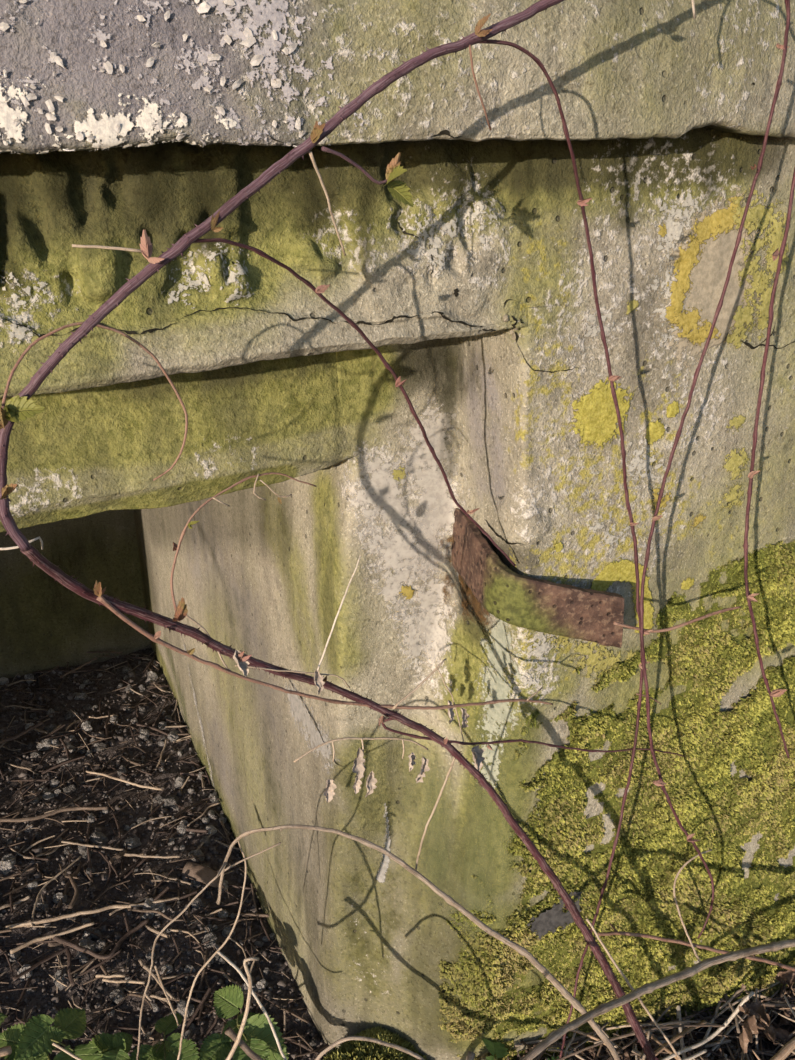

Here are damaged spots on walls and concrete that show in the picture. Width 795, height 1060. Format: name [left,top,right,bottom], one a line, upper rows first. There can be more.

peeling [0,0,40,45]
peeling [0,66,40,112]
peeling [41,40,72,76]
peeling [85,0,345,148]
crack [2,307,495,337]
crack [518,347,577,373]
crack [741,326,795,349]
rust [440,535,489,625]